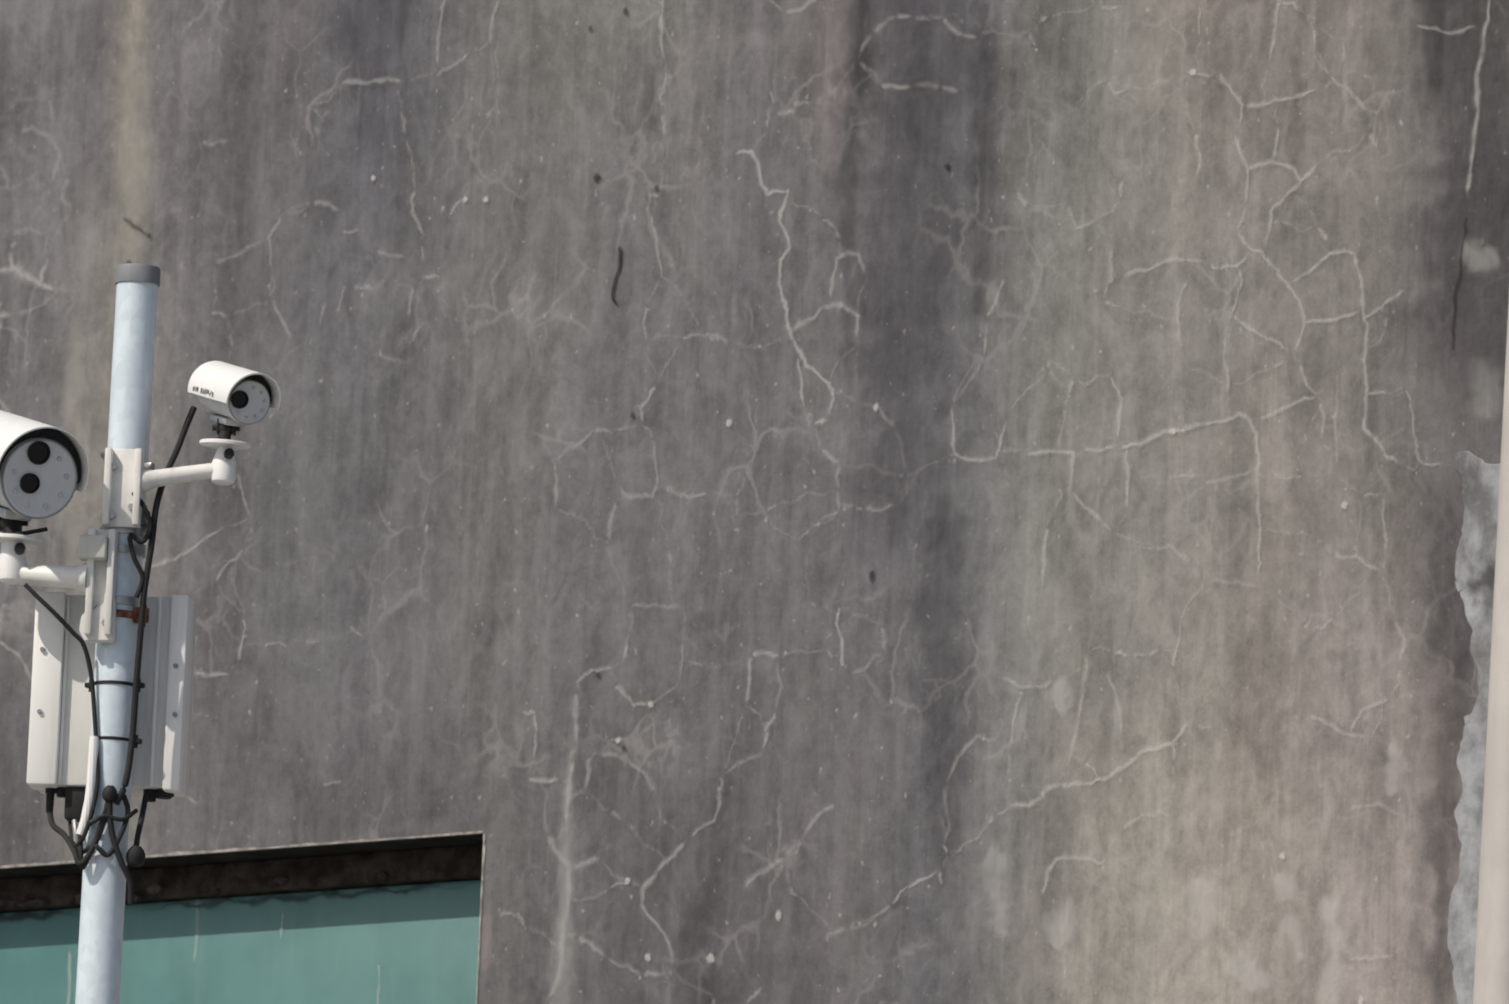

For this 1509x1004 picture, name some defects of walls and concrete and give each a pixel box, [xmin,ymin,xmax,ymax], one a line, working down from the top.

crack [611,247,622,304]
crack [1451,219,1466,347]
peeling [1447,451,1500,1004]